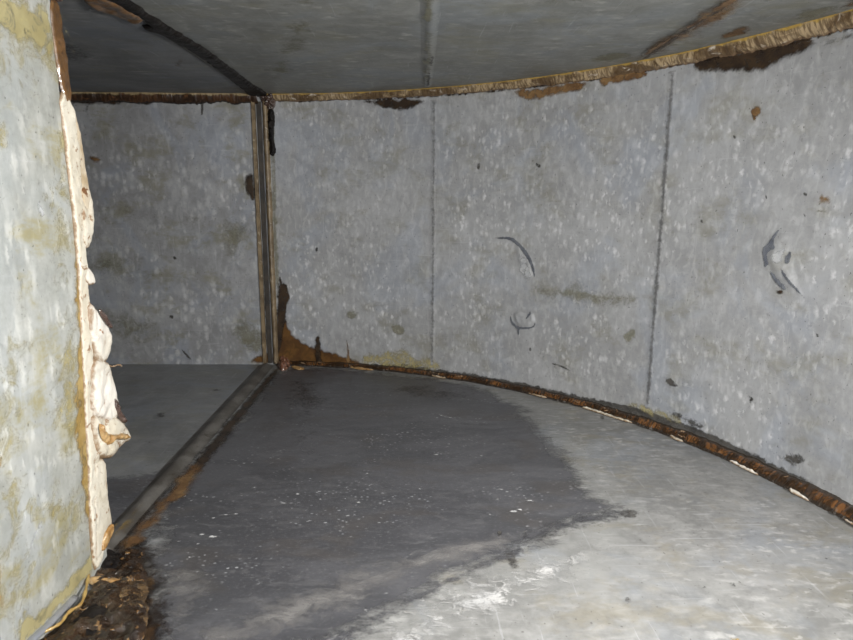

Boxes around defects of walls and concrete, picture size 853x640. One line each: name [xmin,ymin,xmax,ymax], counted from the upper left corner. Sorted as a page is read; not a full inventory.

damp [0,0,53,64]
corrosion [723,27,747,38]
damp [59,340,89,523]
corrosion [123,277,359,547]
damp [107,474,158,523]
damp [147,351,617,640]
damp [20,556,92,640]